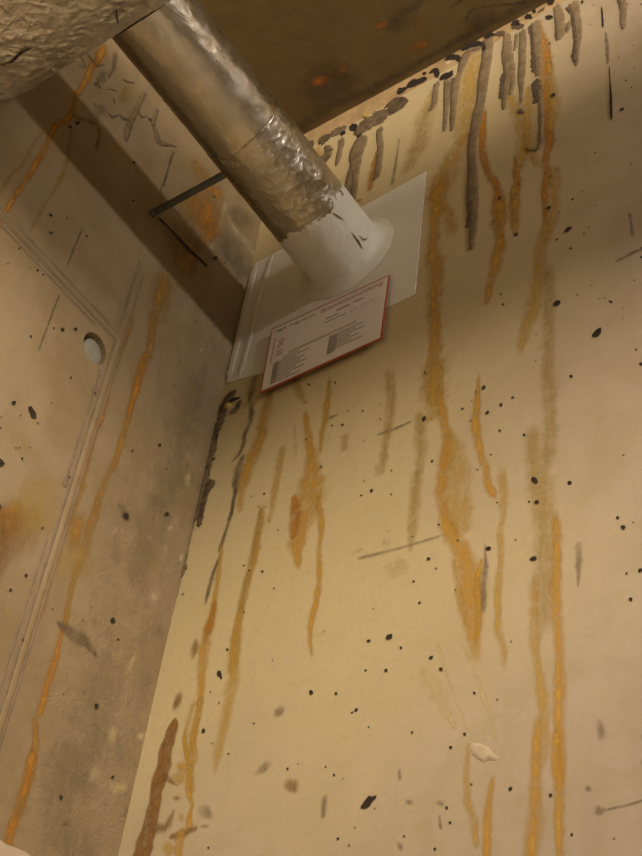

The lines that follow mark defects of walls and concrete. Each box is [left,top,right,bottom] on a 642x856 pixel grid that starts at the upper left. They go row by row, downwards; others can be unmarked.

corrosion [0,46,106,223]
corrosion [478,28,558,348]
corrosion [19,484,105,804]
corrosion [109,276,169,473]
corrosion [133,544,223,856]
crack [177,401,231,593]
corrosion [218,511,263,755]
corrosion [291,381,330,651]
corrosion [418,135,482,646]
corrosion [464,779,493,856]
corrosion [472,384,506,496]
corrosion [528,435,565,856]